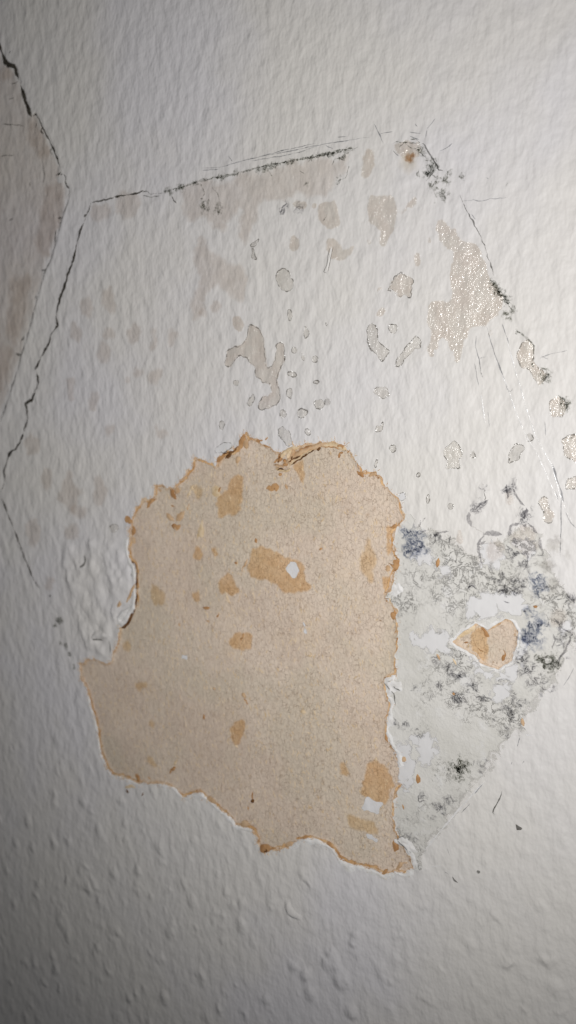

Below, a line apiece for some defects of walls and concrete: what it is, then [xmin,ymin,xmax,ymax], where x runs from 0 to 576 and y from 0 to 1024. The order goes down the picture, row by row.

crack [0,32,176,597]
peeling [215,442,232,453]